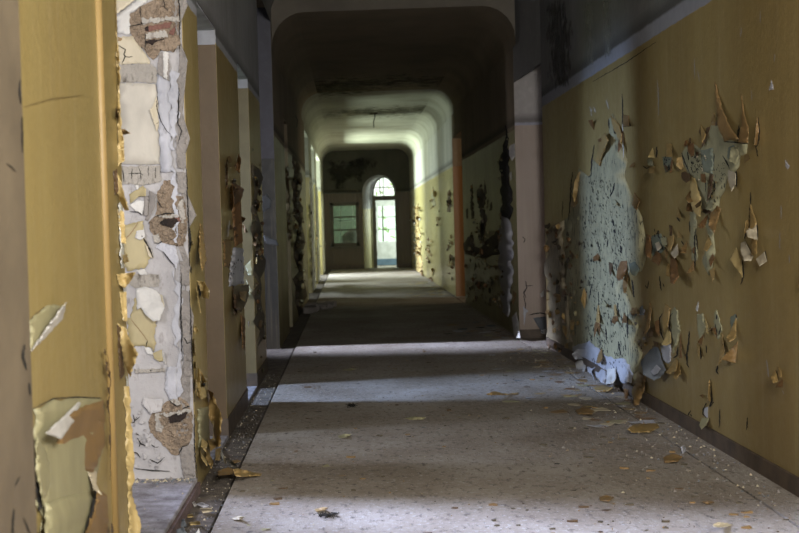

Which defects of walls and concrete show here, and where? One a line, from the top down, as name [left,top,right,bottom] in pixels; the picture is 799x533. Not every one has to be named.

peeling [30,303,66,351]
spalling [113,0,241,533]
peeling [223,154,279,358]
peeling [286,155,318,316]
peeling [409,187,440,281]
peeling [463,83,760,406]
peeling [688,301,738,430]
peeling [730,192,767,283]
peeling [33,396,109,533]